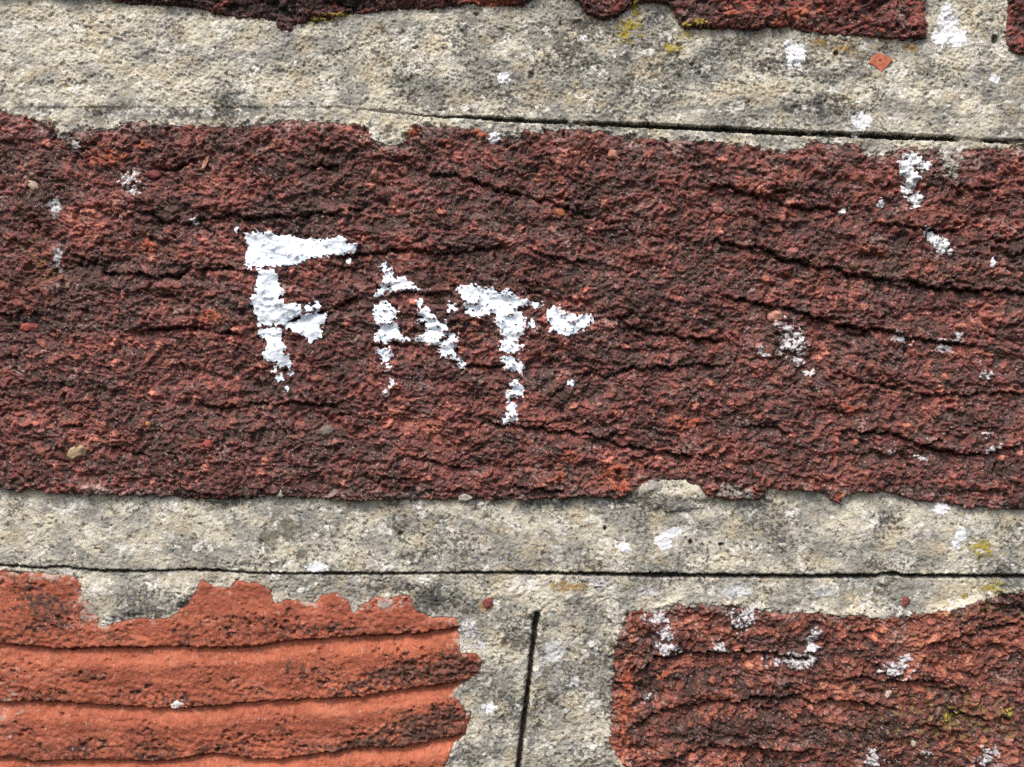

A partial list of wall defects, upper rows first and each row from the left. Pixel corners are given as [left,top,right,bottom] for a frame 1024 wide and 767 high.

crack [0,564,1024,577]